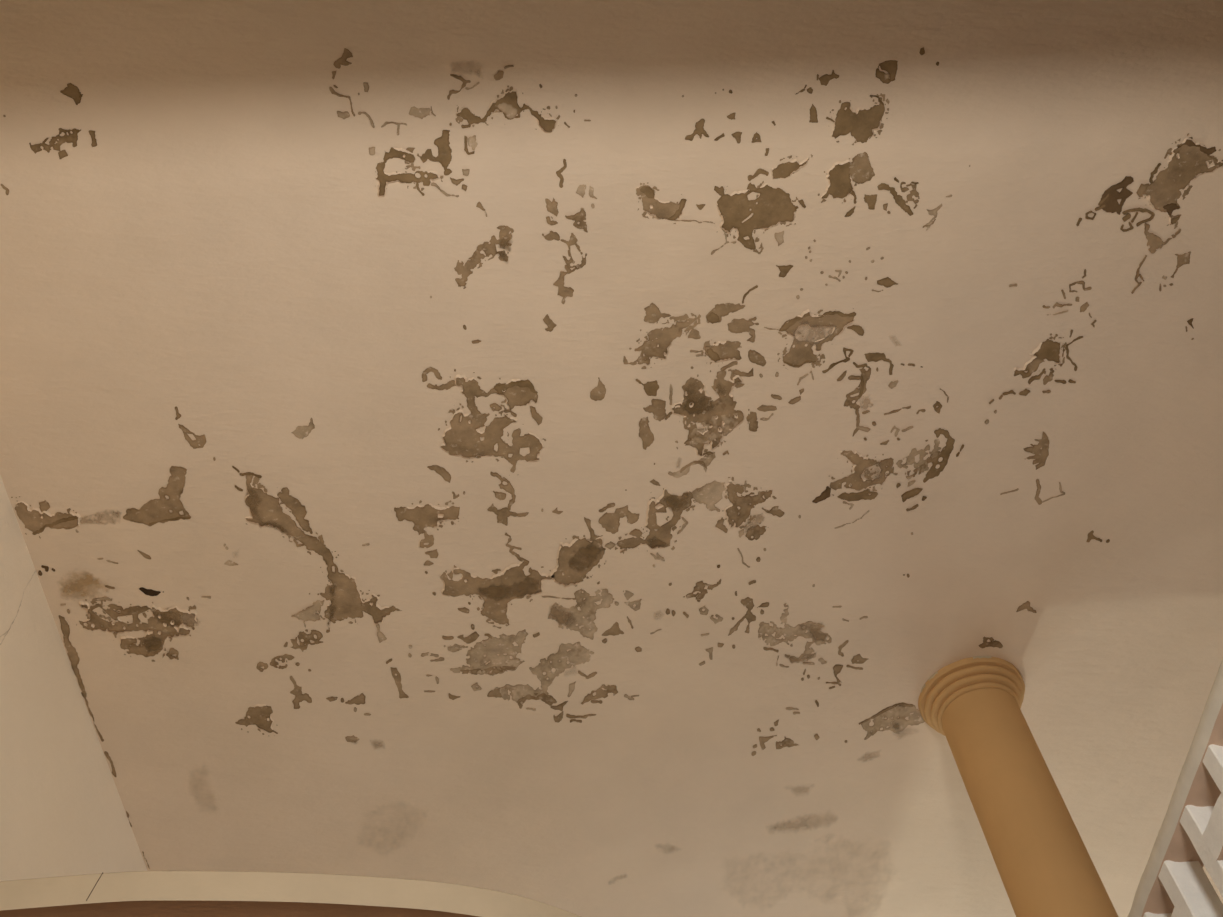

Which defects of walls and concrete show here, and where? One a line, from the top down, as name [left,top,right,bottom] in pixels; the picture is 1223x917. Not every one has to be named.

peeling [29,128,97,159]
peeling [329,48,591,197]
peeling [454,225,514,289]
flaking render [635,113,813,255]
flaking render [795,60,952,230]
flaking render [1076,133,1223,294]
flaking render [985,333,1076,424]
flaking render [11,466,191,539]
flaking render [394,285,964,723]
flaking render [59,587,211,698]
flaking render [232,466,402,716]
peeling [235,704,278,736]